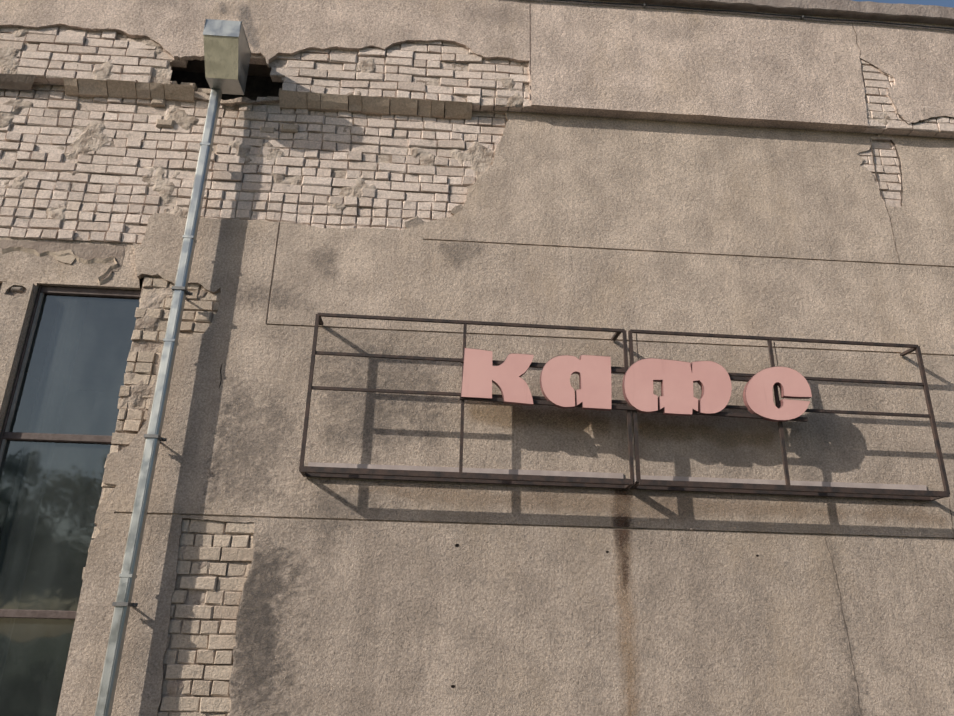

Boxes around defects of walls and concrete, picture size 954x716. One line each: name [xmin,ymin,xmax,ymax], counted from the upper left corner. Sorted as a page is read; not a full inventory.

spalling [0,26,535,285]
crack [852,23,954,265]
spalling [858,60,954,207]
spalling [104,275,174,468]
spalling [179,283,221,339]
spalling [99,482,117,504]
spalling [158,513,254,716]